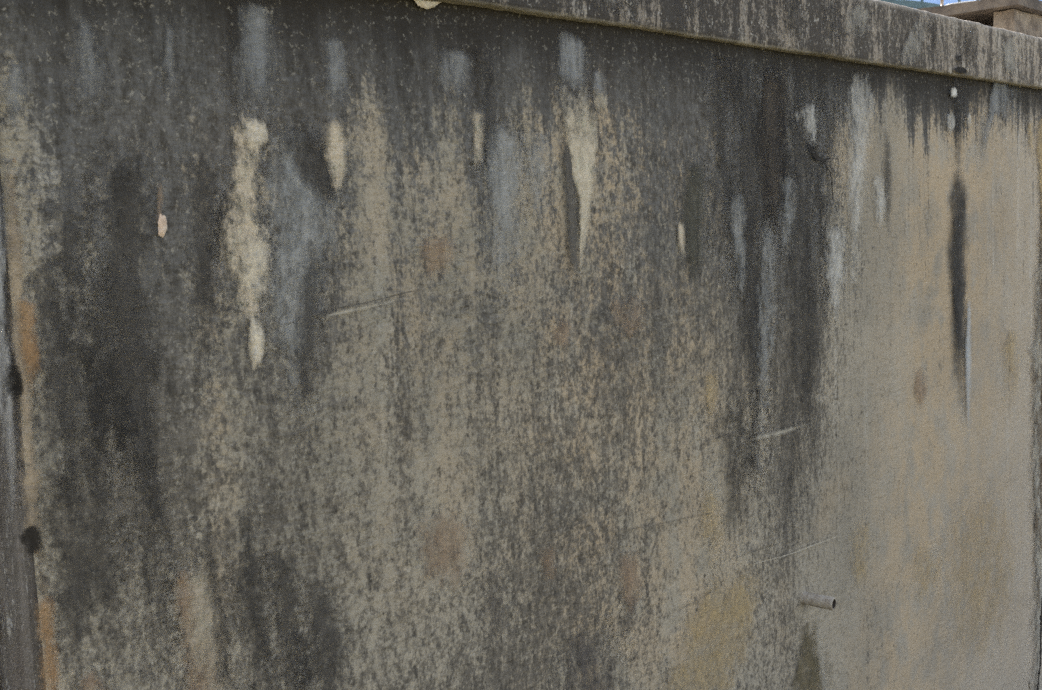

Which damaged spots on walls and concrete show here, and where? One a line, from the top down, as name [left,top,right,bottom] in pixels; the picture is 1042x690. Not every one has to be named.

leakage [246,11,266,85]
leakage [0,219,14,458]
leakage [475,62,545,262]
leakage [564,146,578,269]
leakage [678,164,704,274]
leakage [716,68,842,519]
leakage [849,84,871,229]
leakage [876,143,891,216]
leakage [950,175,971,416]
crack [1029,244,1042,690]